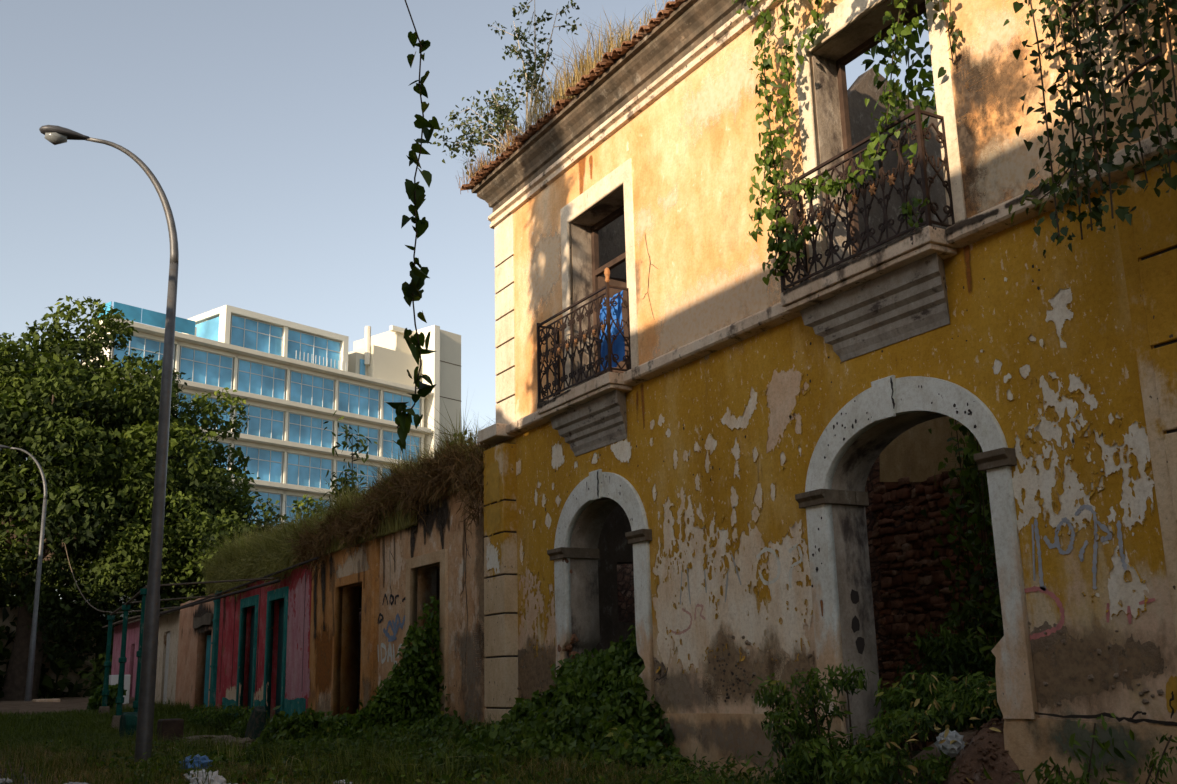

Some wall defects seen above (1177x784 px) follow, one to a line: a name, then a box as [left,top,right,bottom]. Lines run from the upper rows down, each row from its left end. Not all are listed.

leakage [313,554,334,638]
leakage [382,494,450,587]
leakage [455,506,486,723]
peeling [517,539,580,698]
peeling [533,351,822,703]
leakage [650,627,817,769]
peeling [980,349,1177,713]